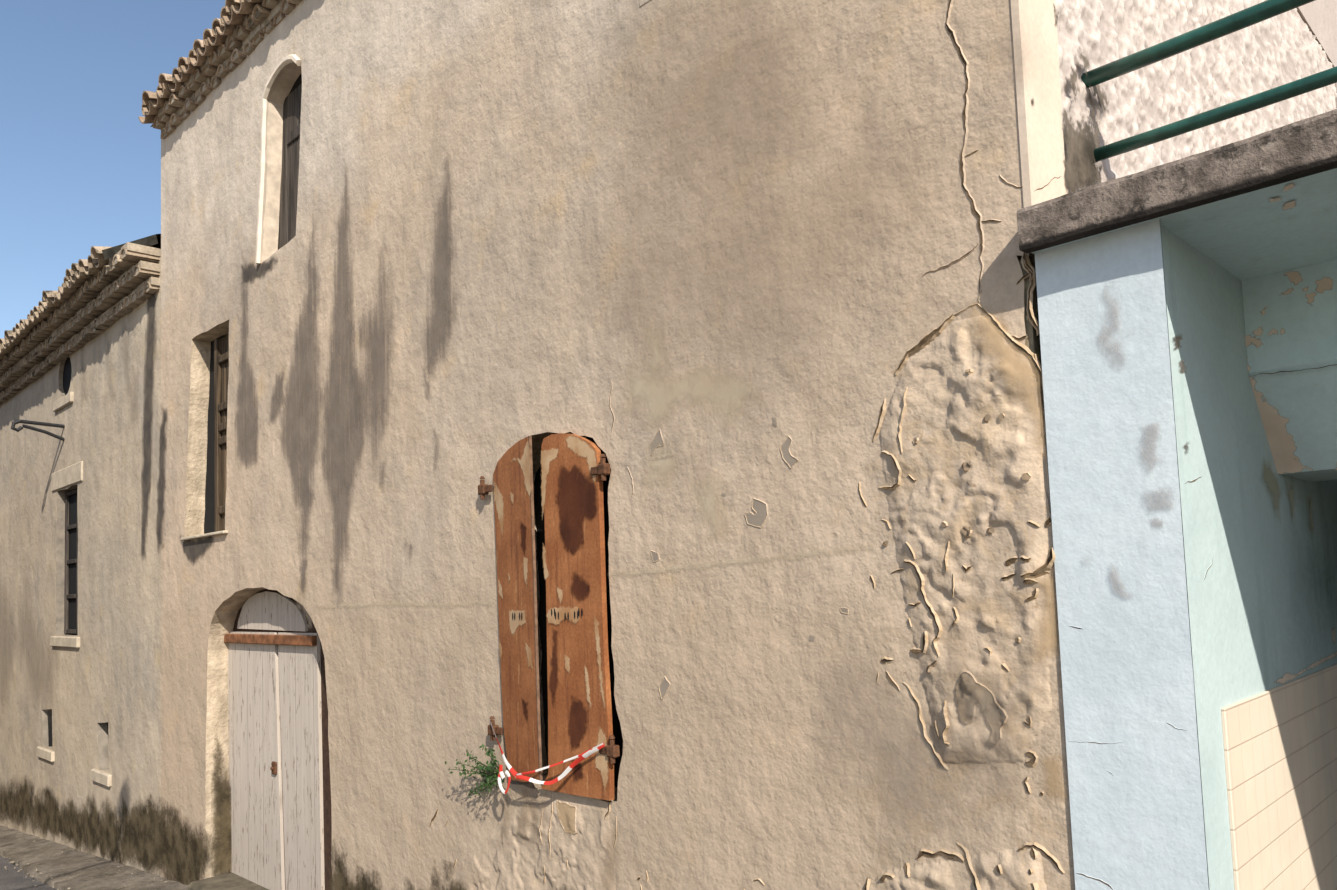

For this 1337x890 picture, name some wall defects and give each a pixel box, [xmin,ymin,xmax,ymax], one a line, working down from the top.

leakage [427,179,454,372]
crack [999,174,1061,191]
leakage [237,183,389,597]
crack [858,0,1046,771]
peeling [1245,307,1312,474]